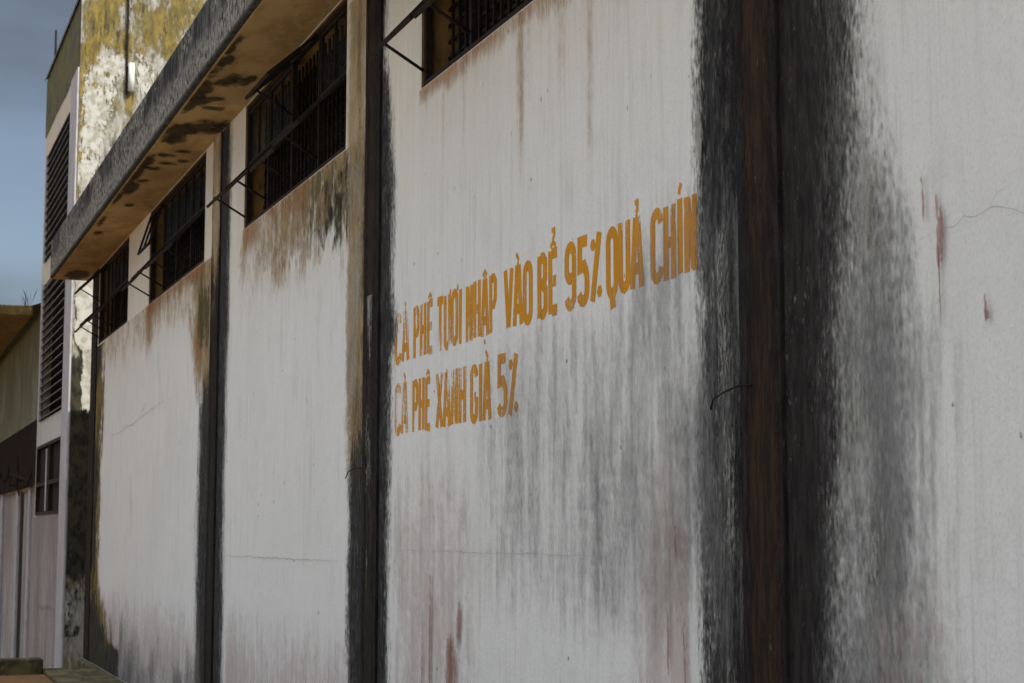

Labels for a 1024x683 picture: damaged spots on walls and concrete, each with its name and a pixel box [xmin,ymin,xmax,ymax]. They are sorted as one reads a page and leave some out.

damp [64,269,112,661]
damp [112,36,256,683]
damp [264,0,397,683]
corrosion [422,26,502,95]
damp [691,0,911,683]